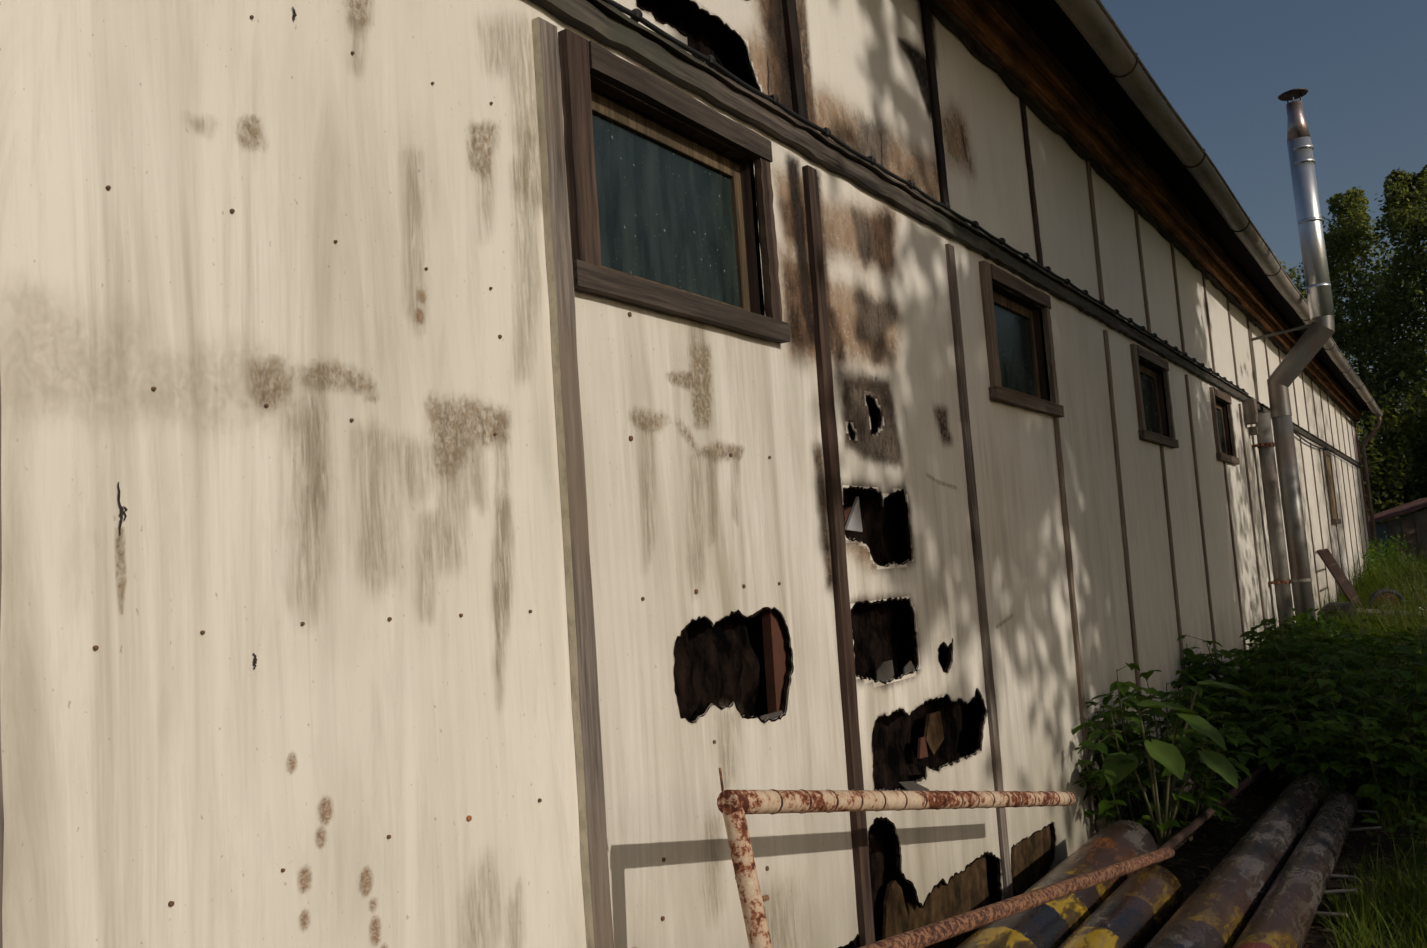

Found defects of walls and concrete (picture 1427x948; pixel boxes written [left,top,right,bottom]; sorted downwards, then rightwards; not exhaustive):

water stain [472,126,493,172]
water stain [254,362,286,404]
water stain [430,400,507,473]
peeling [876,660,915,682]